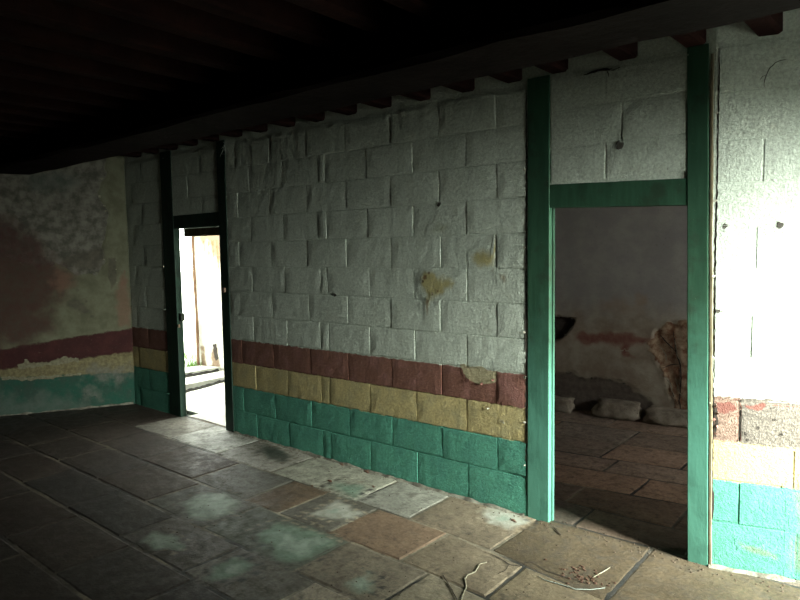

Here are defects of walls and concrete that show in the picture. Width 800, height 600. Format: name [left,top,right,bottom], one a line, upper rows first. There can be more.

damp [0,200,96,360]
rust [417,265,458,318]
rust [467,238,503,276]
peeling [0,354,83,382]
peeling [458,362,528,410]
flaking render [554,368,656,418]
peeling [712,394,800,452]